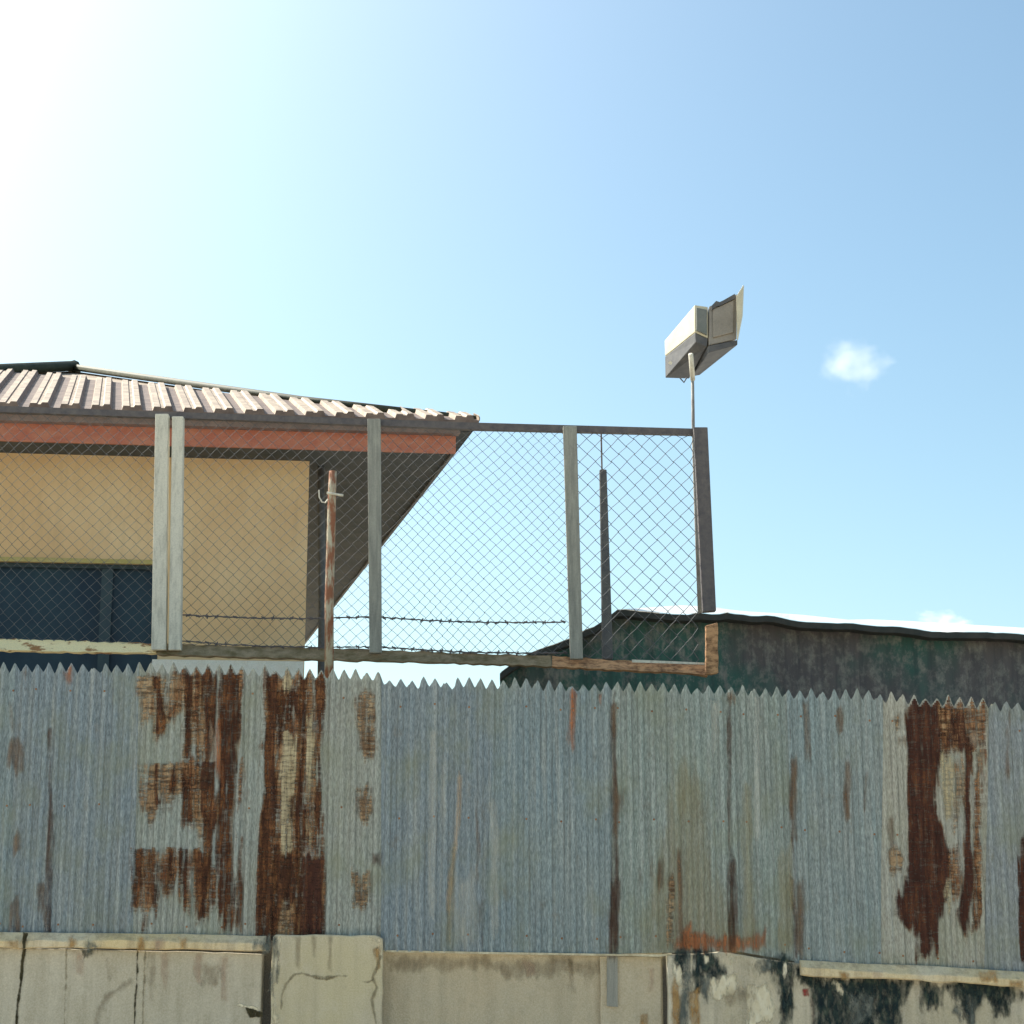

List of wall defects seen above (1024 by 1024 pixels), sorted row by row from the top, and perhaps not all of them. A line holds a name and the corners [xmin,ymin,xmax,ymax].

rust [354,691,375,762]
rust [133,665,244,951]
rust [255,667,326,941]
rust [357,784,372,822]
rust [609,712,620,953]
rust [889,696,988,964]
rust [658,852,765,952]
crack [15,932,28,1024]
crack [134,950,145,1024]
crack [372,957,381,1017]
water stain [673,949,727,1024]
water stain [761,953,1024,1024]